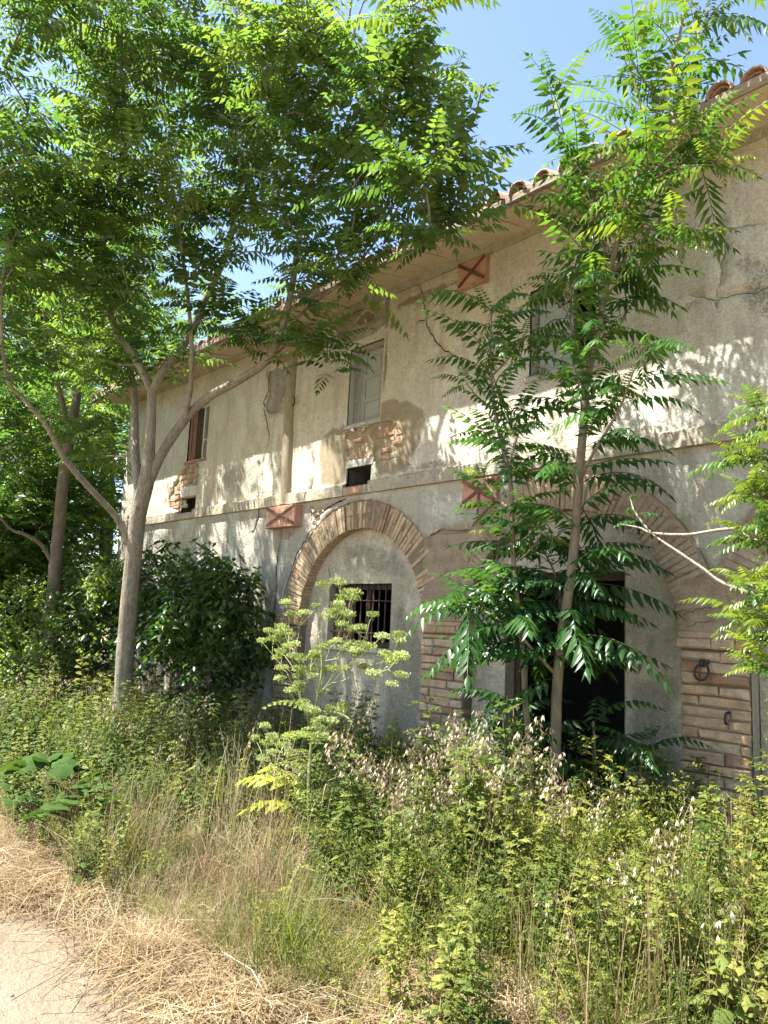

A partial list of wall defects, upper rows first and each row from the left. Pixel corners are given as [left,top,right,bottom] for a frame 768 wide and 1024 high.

crack [689,222,768,309]
spalling [346,421,405,462]
spalling [164,463,199,511]